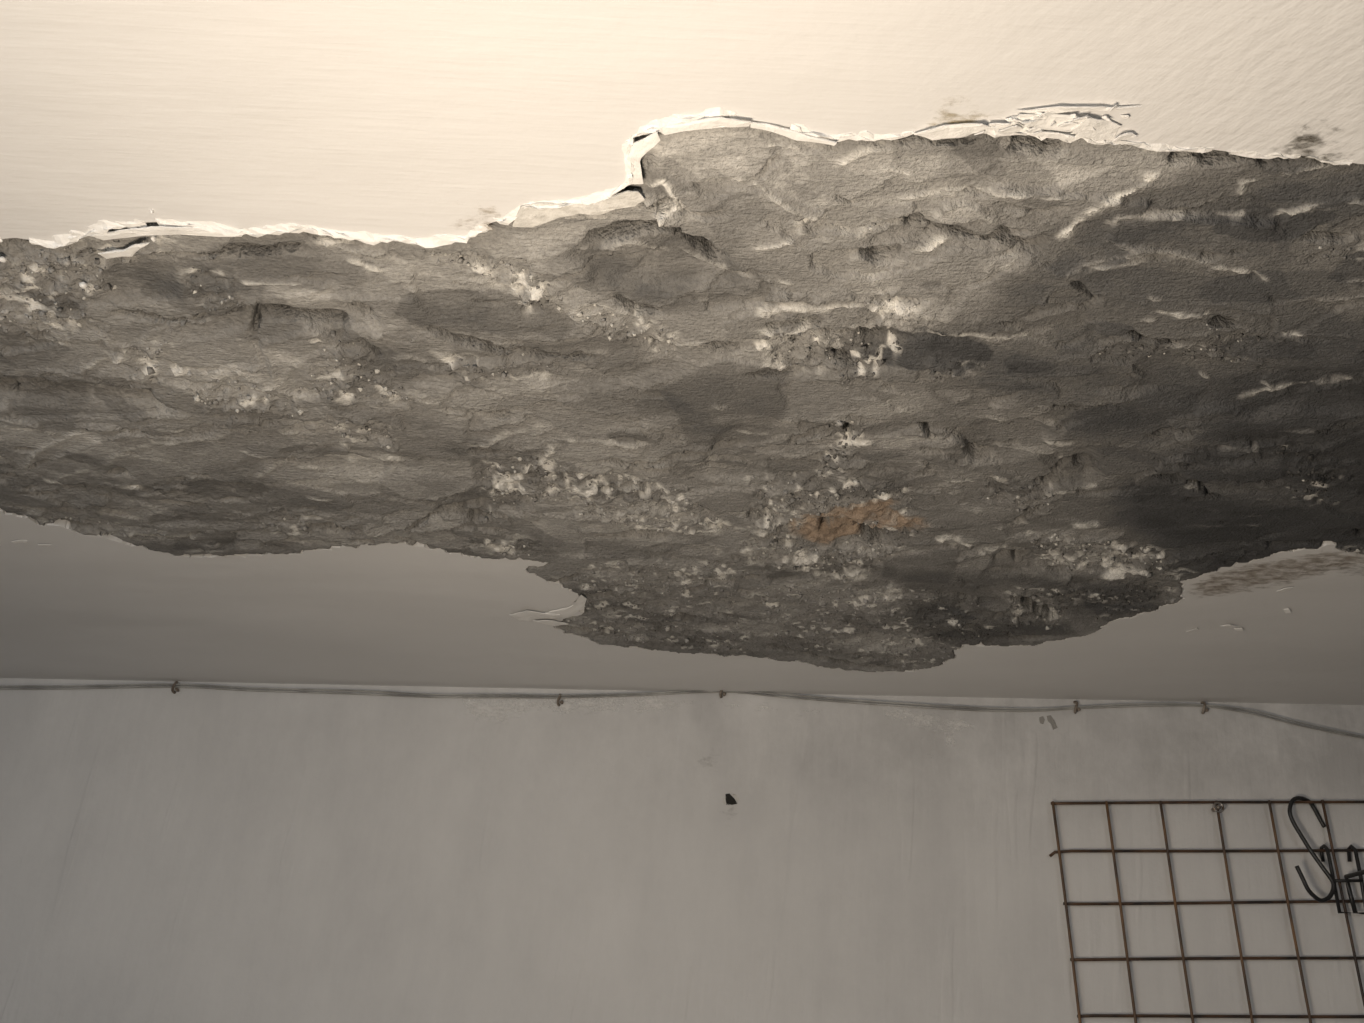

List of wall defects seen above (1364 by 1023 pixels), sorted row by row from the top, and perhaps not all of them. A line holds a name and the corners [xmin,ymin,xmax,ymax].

spalling [0,105,1364,672]